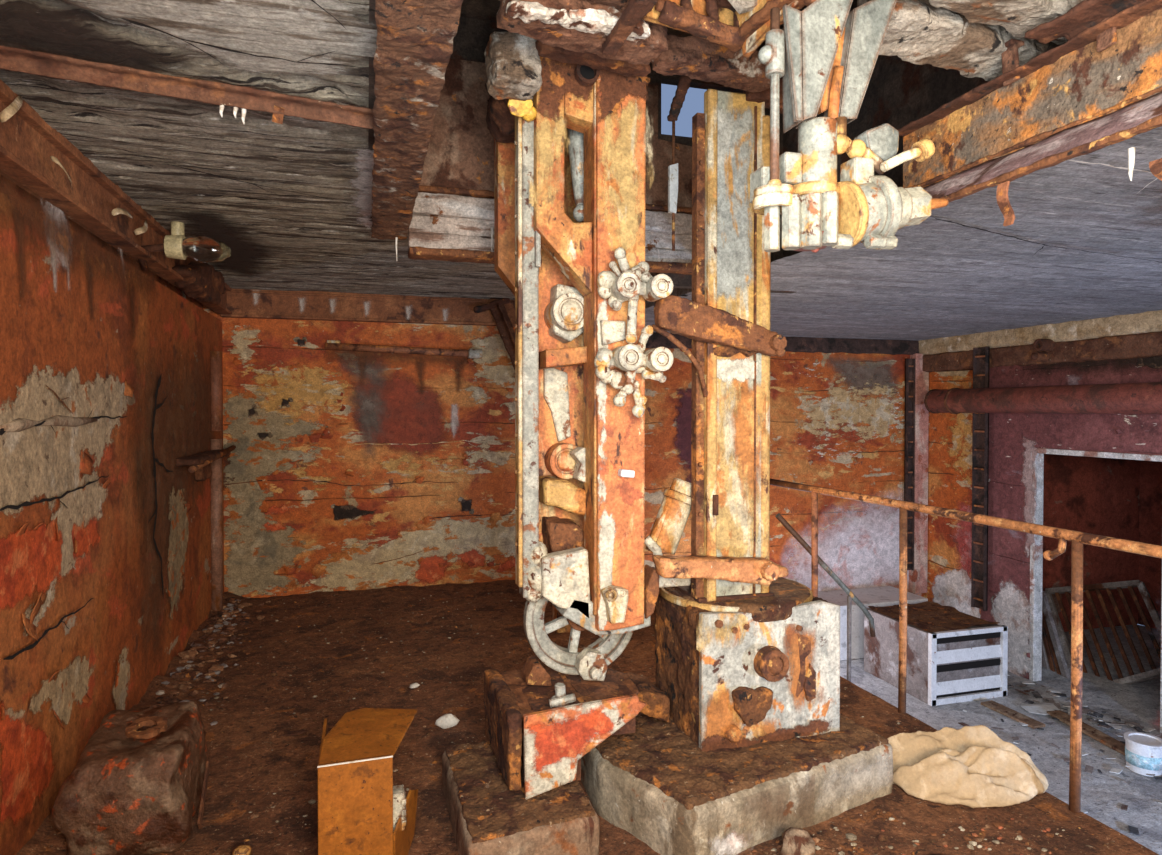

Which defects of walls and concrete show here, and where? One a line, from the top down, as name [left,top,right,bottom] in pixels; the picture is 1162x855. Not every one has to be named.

rust [0,179,154,337]
crack [0,475,109,511]
peeling [0,365,134,641]
crack [34,374,173,594]
peeling [223,324,515,598]
crack [3,598,93,660]
peeling [991,582,1033,676]
peeling [1,656,95,730]
peeling [111,646,131,710]